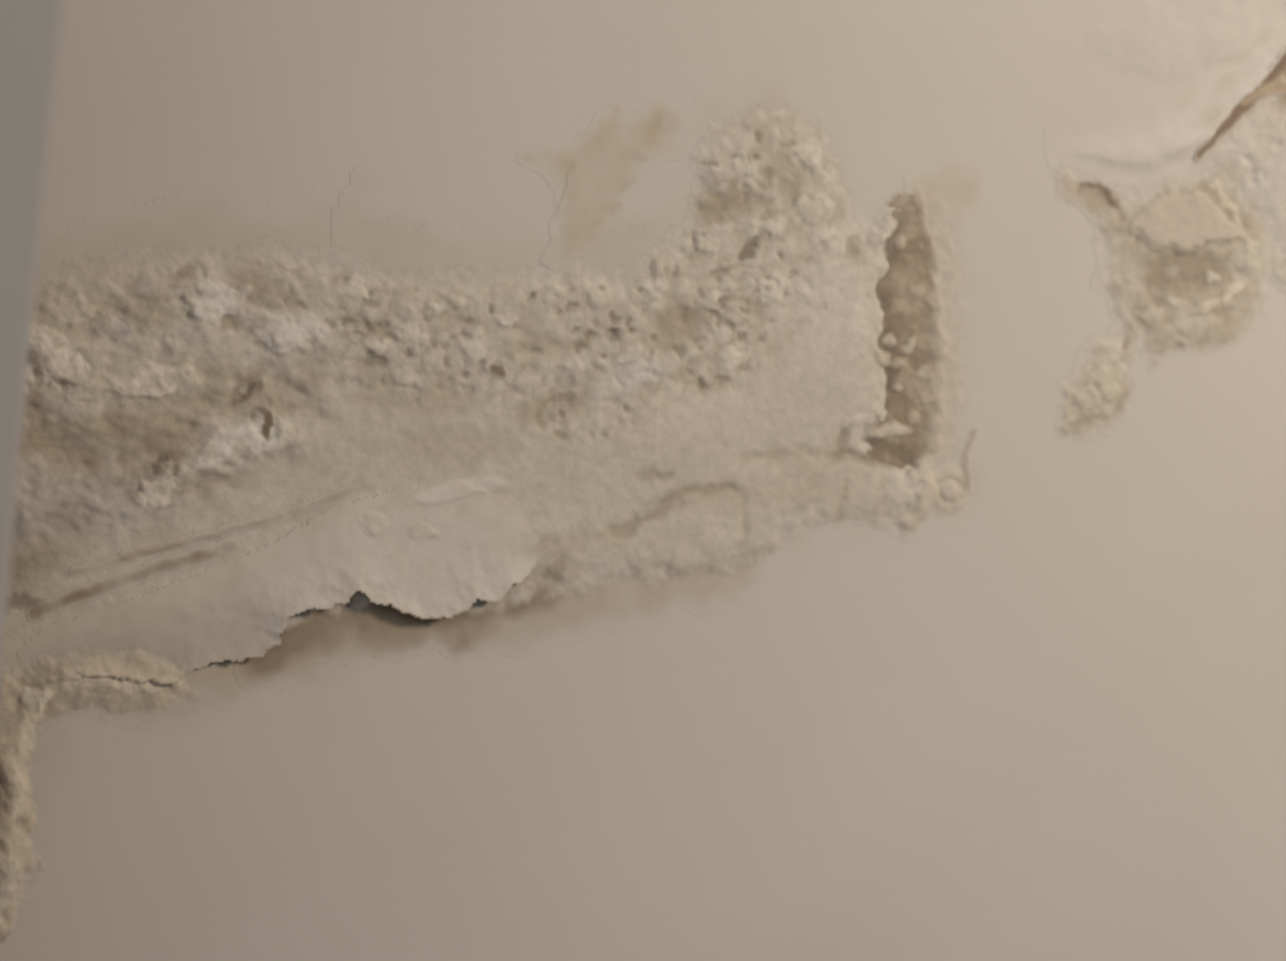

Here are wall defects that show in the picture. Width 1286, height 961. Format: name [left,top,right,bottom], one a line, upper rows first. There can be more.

flaking render [0,103,972,945]
water stain [0,63,1003,961]
flaking render [1053,73,1286,443]